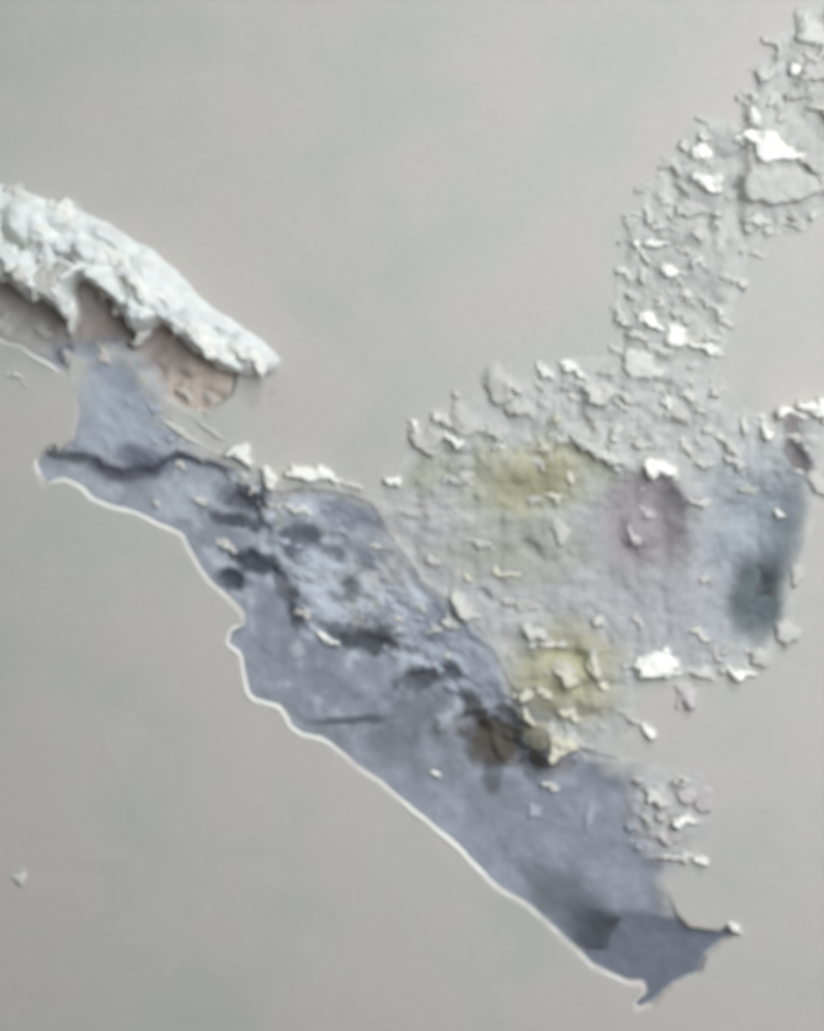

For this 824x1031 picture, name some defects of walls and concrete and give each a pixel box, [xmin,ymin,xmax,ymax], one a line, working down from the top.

spalling [33,342,744,1010]
peeling [276,0,824,766]